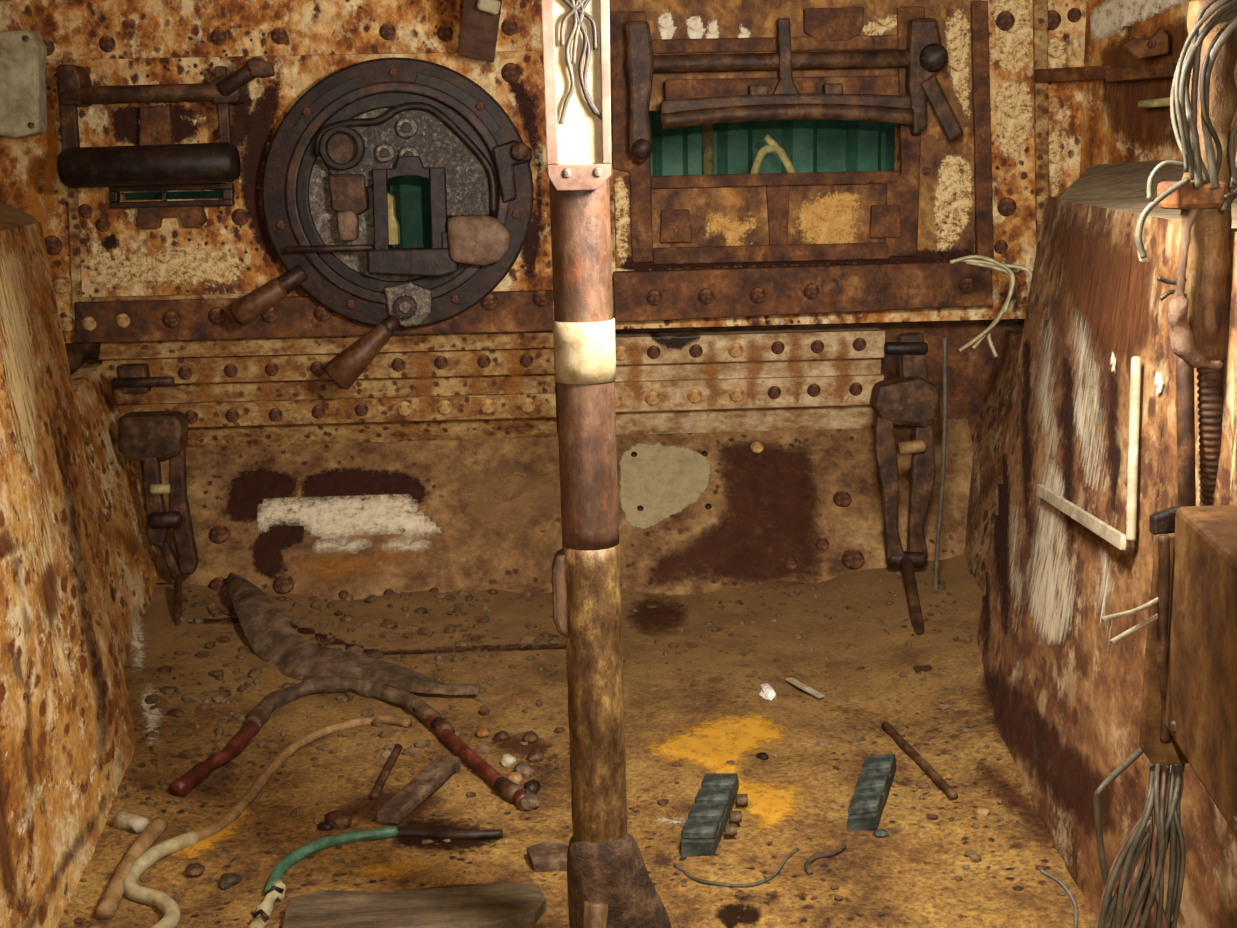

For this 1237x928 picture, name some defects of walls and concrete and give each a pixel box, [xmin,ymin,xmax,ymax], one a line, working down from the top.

corrosion [22,99,58,239]
corrosion [109,102,202,144]
corrosion [230,75,282,266]
corrosion [508,81,545,278]
corrosion [621,248,975,271]
corrosion [1052,219,1160,510]
corrosion [0,531,19,557]
corrosion [39,563,58,622]
corrosion [59,430,108,765]
corrosion [130,610,145,669]
corrosion [141,687,162,744]
corrosion [0,748,18,906]